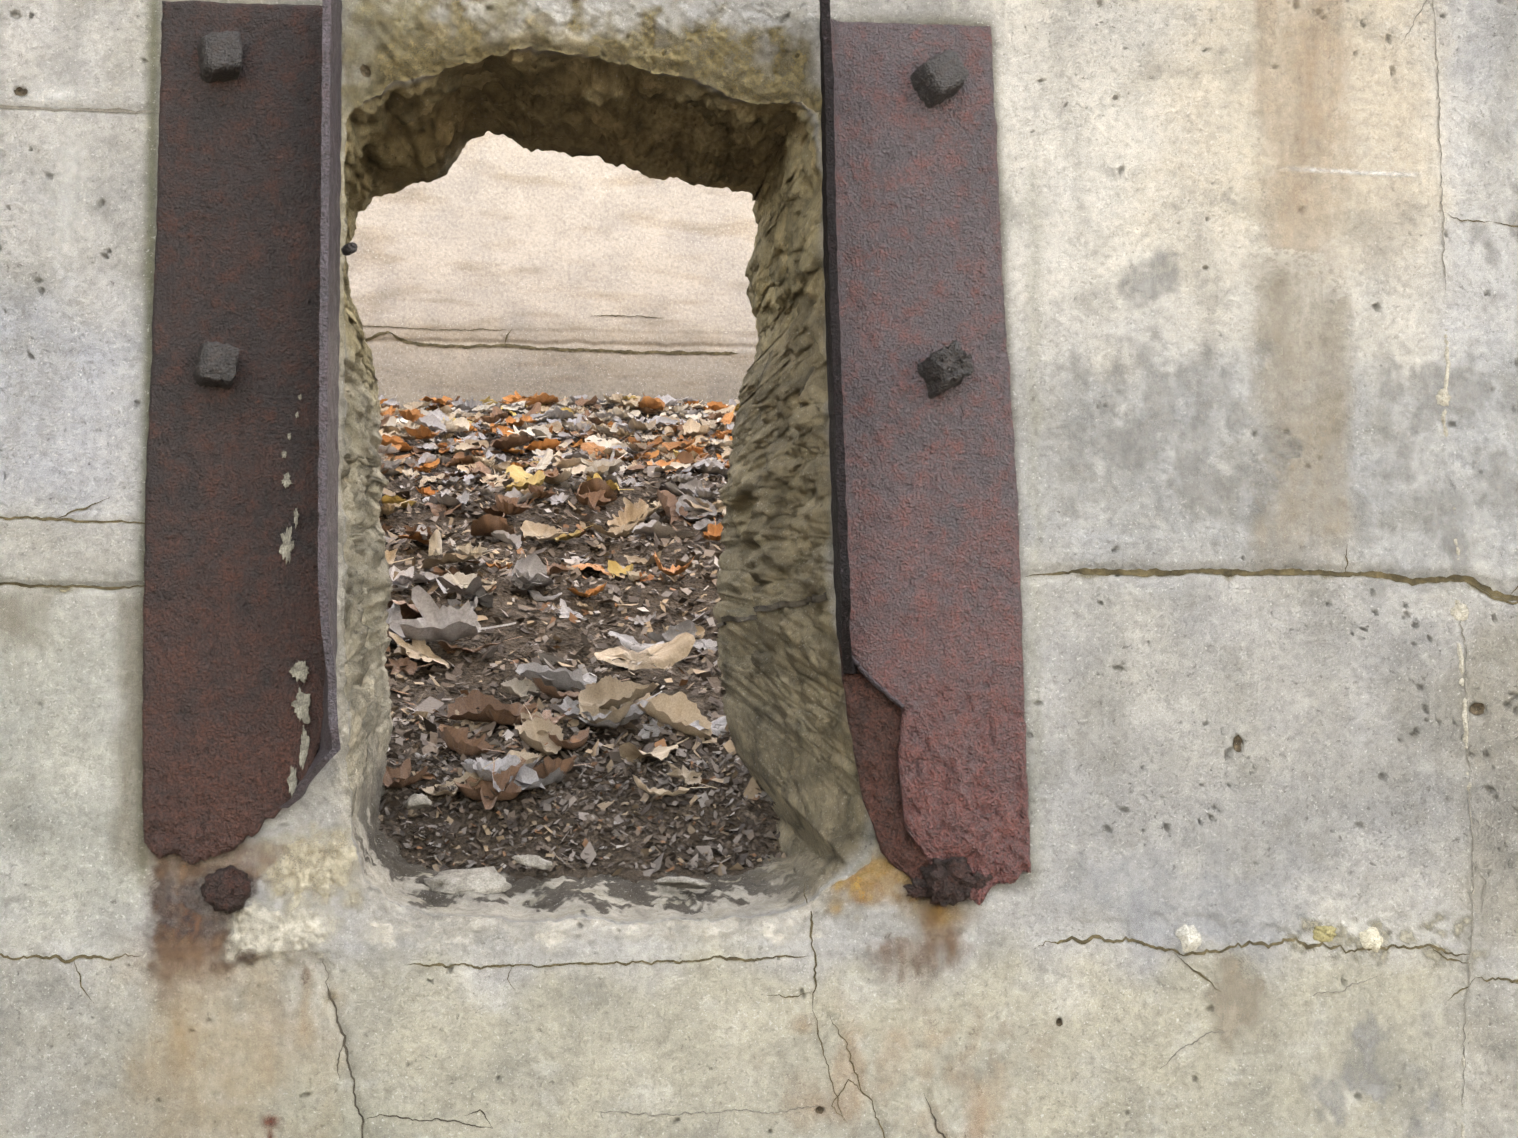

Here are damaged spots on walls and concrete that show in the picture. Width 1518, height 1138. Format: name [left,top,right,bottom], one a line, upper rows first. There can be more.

crack [0,105,154,114]
crack [1401,0,1518,290]
water stain [1383,364,1491,455]
crack [0,498,145,524]
crack [0,582,144,590]
peeling [287,660,311,798]
crack [1025,544,1518,1105]
rust [153,844,308,973]
rust [833,859,958,925]
crack [0,953,139,1003]
crack [322,962,492,1138]
crack [409,884,885,1138]